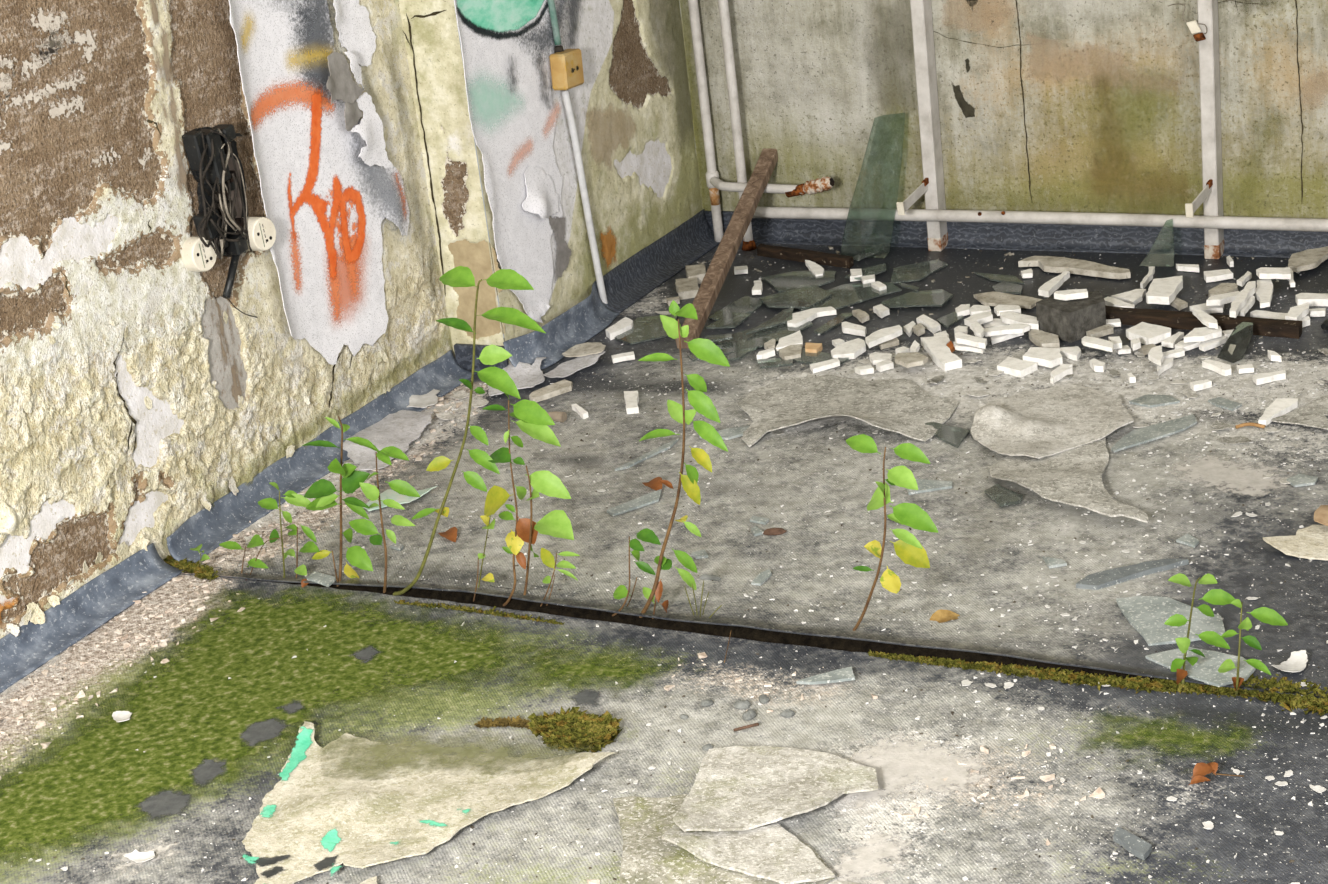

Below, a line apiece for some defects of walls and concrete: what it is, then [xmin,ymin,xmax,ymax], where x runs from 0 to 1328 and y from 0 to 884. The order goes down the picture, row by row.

flaking render [0,0,174,345]
peeling [169,0,410,379]
flaking render [609,0,671,109]
corrosion [785,183,806,198]
crack [934,0,1041,200]
crack [1295,0,1304,197]
flaking render [0,354,194,637]
peeling [229,476,239,496]
peeling [112,711,132,722]